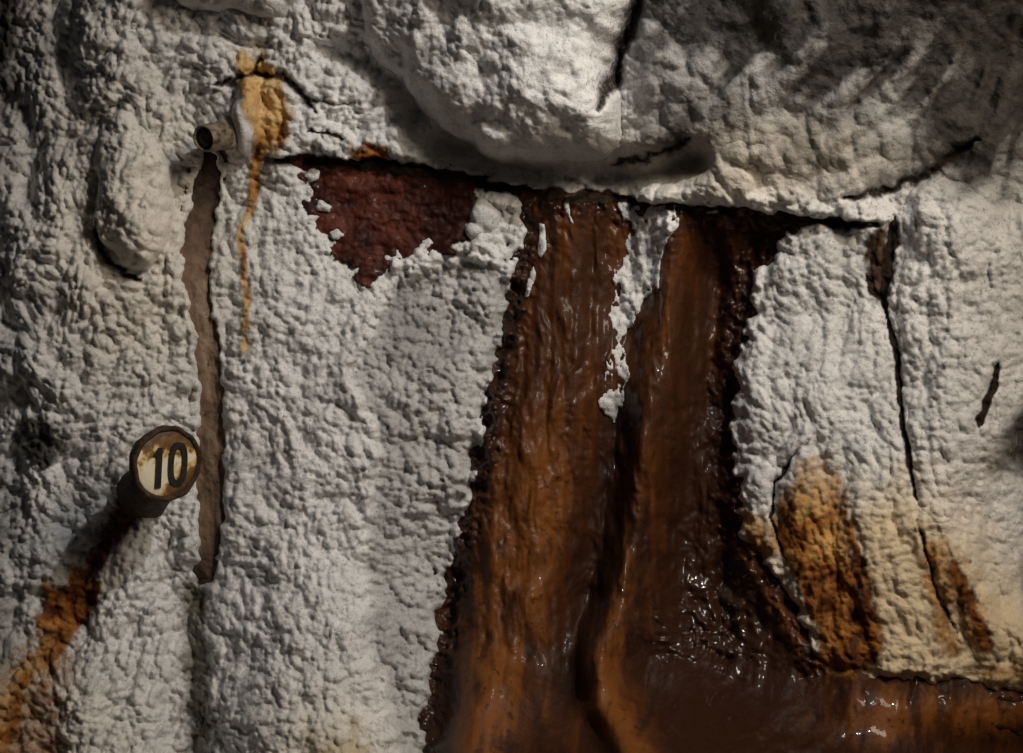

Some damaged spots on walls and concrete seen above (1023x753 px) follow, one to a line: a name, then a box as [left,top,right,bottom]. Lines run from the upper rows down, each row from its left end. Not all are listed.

rust [236,44,293,352]
spalling [289,156,478,288]
rust [417,188,1023,753]
crack [672,139,976,500]
rust [0,501,141,753]